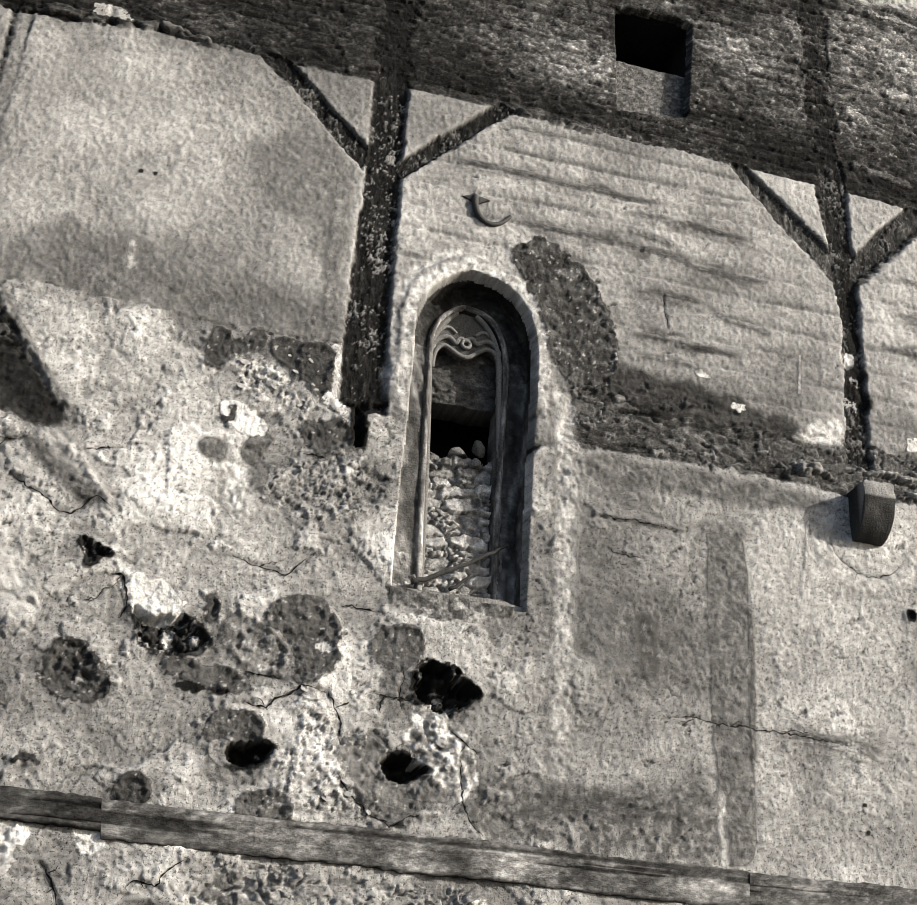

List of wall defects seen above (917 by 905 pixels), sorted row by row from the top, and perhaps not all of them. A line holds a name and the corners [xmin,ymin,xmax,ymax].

spalling [511,236,619,393]
flaking render [204,326,390,525]
crack [12,473,107,514]
spalling [77,534,115,567]
crack [234,554,312,579]
spalling [36,636,111,703]
flaking render [120,572,484,830]
crack [666,716,840,743]
spalling [112,769,153,803]
crack [451,731,483,836]
crack [40,862,58,905]